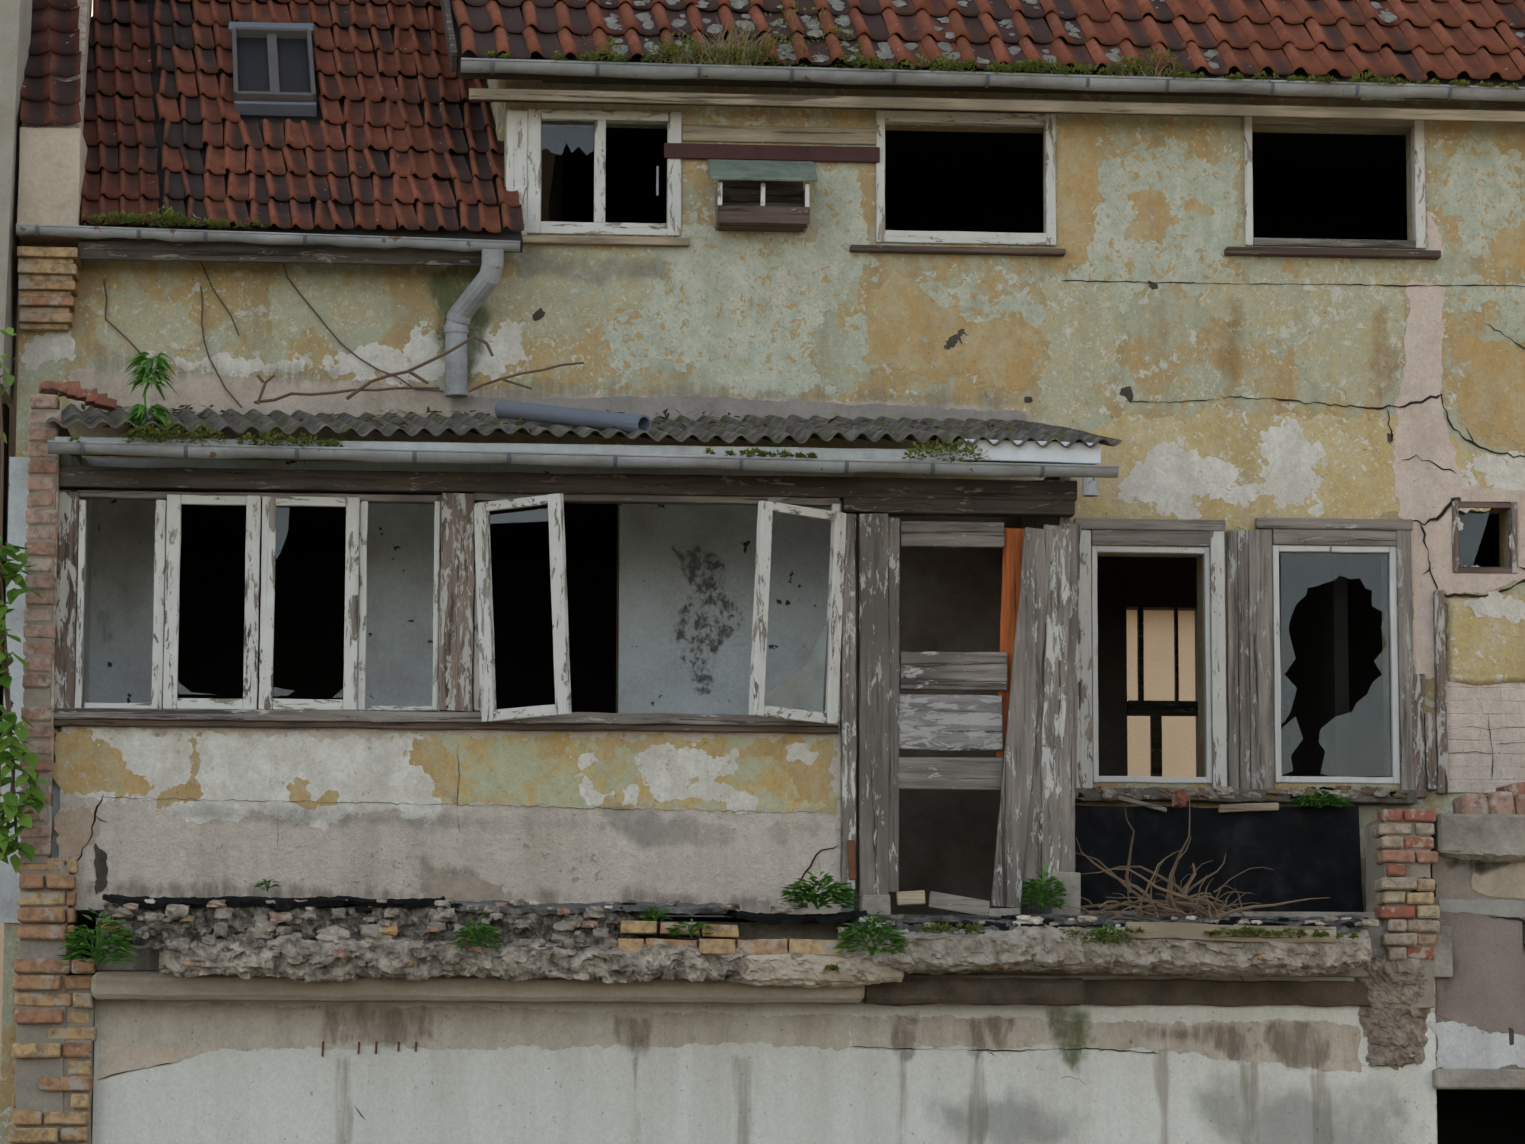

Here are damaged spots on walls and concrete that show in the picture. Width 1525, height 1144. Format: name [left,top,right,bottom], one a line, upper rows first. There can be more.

peeling [21,330,76,371]
peeling [81,273,445,387]
peeling [916,116,1406,533]
crack [1061,280,1525,289]
peeling [1437,129,1525,531]
crack [1132,394,1525,598]
leakage [672,547,734,693]
peeling [1463,590,1525,624]
peeling [53,726,841,895]
peeling [1410,877,1525,1069]
crack [1490,915,1525,923]